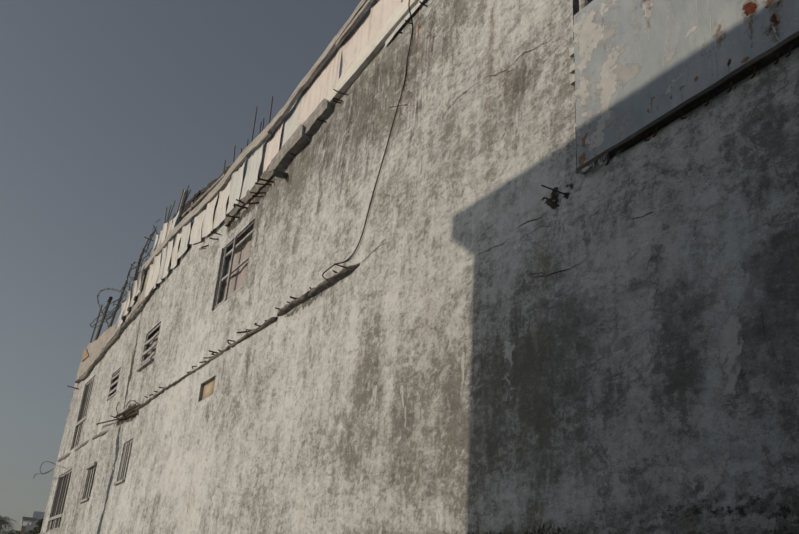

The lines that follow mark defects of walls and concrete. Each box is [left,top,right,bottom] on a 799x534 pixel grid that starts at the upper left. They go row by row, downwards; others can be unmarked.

rust [743,0,780,36]
crack [448,40,551,109]
peeling [571,0,620,172]
spalling [227,179,276,235]
crack [469,212,550,260]
crack [530,262,583,278]